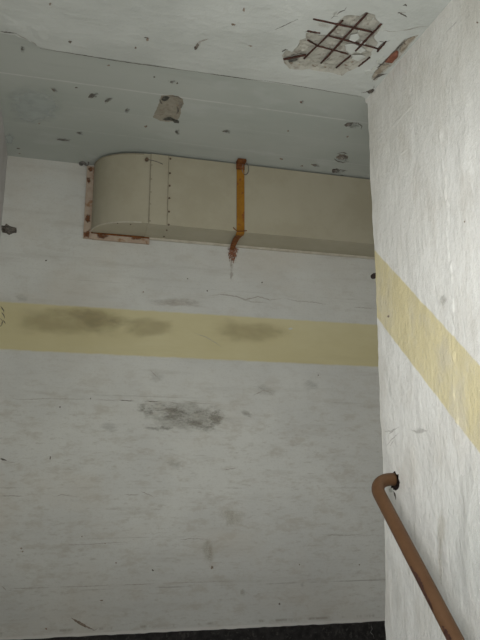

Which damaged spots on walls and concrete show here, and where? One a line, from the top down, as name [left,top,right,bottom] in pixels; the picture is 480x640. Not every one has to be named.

spalling [282,8,418,81]
peeling [153,95,184,123]